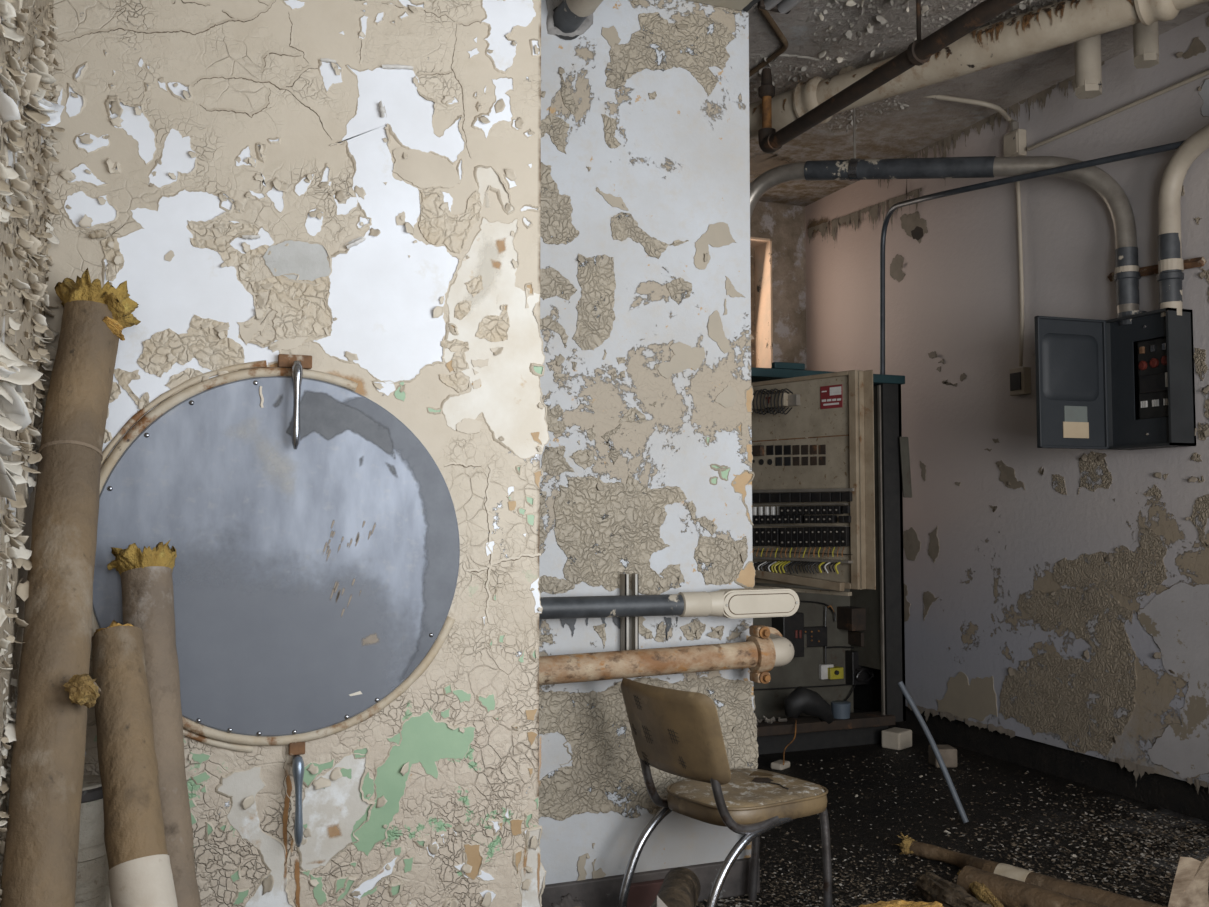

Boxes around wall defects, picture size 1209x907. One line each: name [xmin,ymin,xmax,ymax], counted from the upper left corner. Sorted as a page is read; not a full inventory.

crack [57,0,334,140]
crack [355,0,481,158]
peeling [749,0,979,96]
peeling [707,284,733,354]
peeling [0,0,621,907]
peeling [738,387,753,463]
peeling [639,616,724,643]
peeling [736,551,755,587]
peeling [1137,582,1209,779]
crack [280,745,301,907]
rust [283,775,300,907]
rust [328,826,340,837]